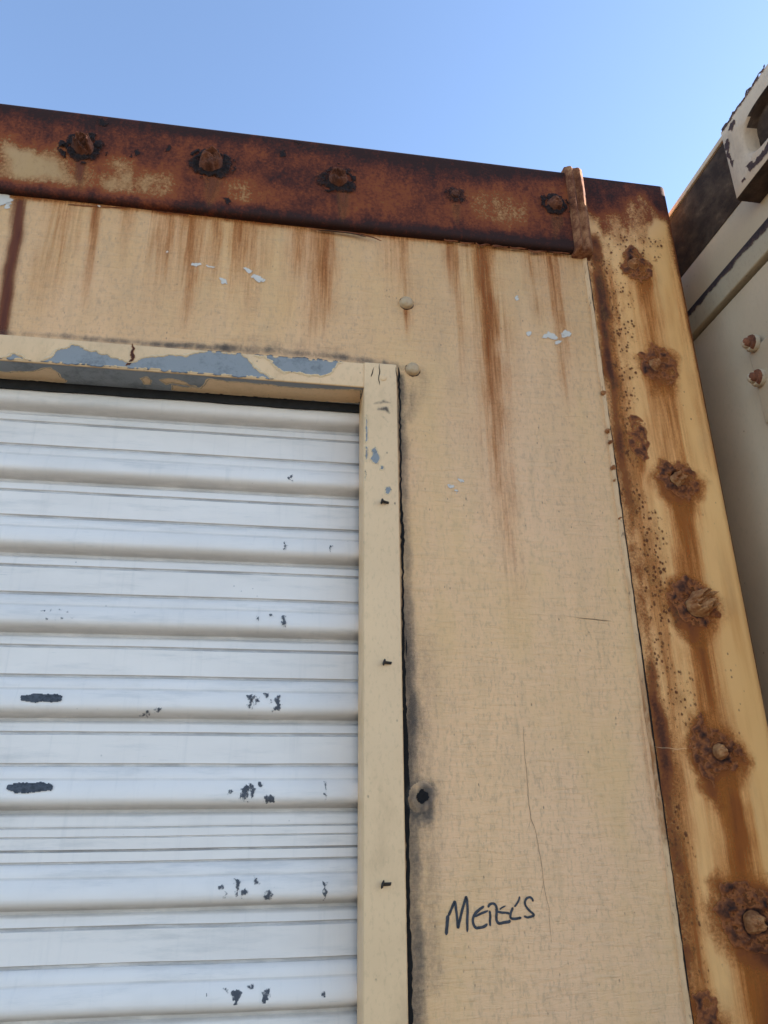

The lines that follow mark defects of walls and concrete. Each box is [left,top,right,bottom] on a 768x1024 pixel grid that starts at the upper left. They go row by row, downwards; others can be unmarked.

peeling [0,342,384,471]
corrosion [0,104,574,412]
peeling [526,330,572,345]
corrosion [583,177,768,1024]